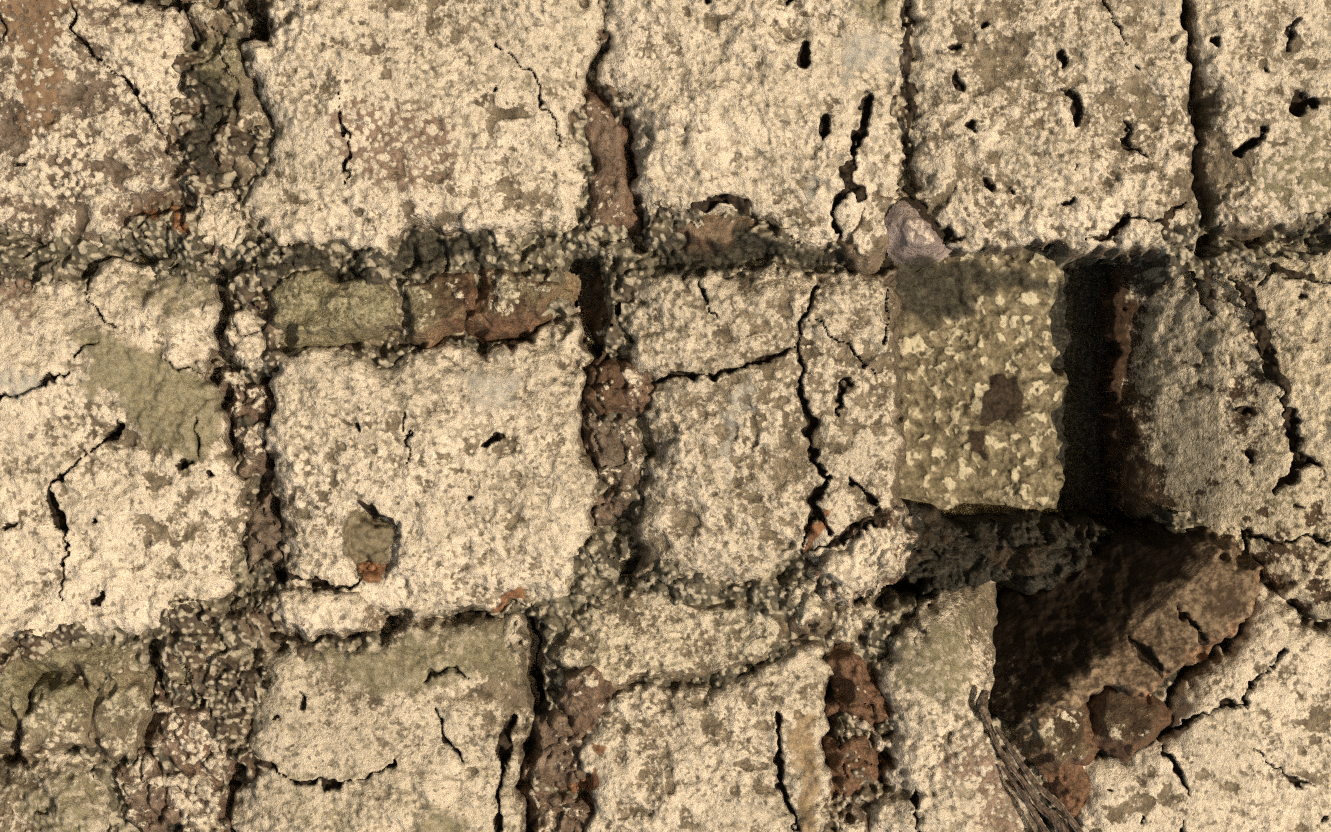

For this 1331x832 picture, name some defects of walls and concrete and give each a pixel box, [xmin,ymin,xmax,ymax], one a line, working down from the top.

crack [69,9,174,156]
peeling [269,268,581,352]
crack [655,285,891,548]
damp [895,257,1054,325]
damp [968,374,1023,460]
damp [1082,247,1145,527]
crack [1202,218,1331,493]
crack [46,473,70,584]
spalling [342,500,397,583]
crack [773,711,801,830]
peeling [1015,686,1173,822]
crack [1157,649,1286,794]